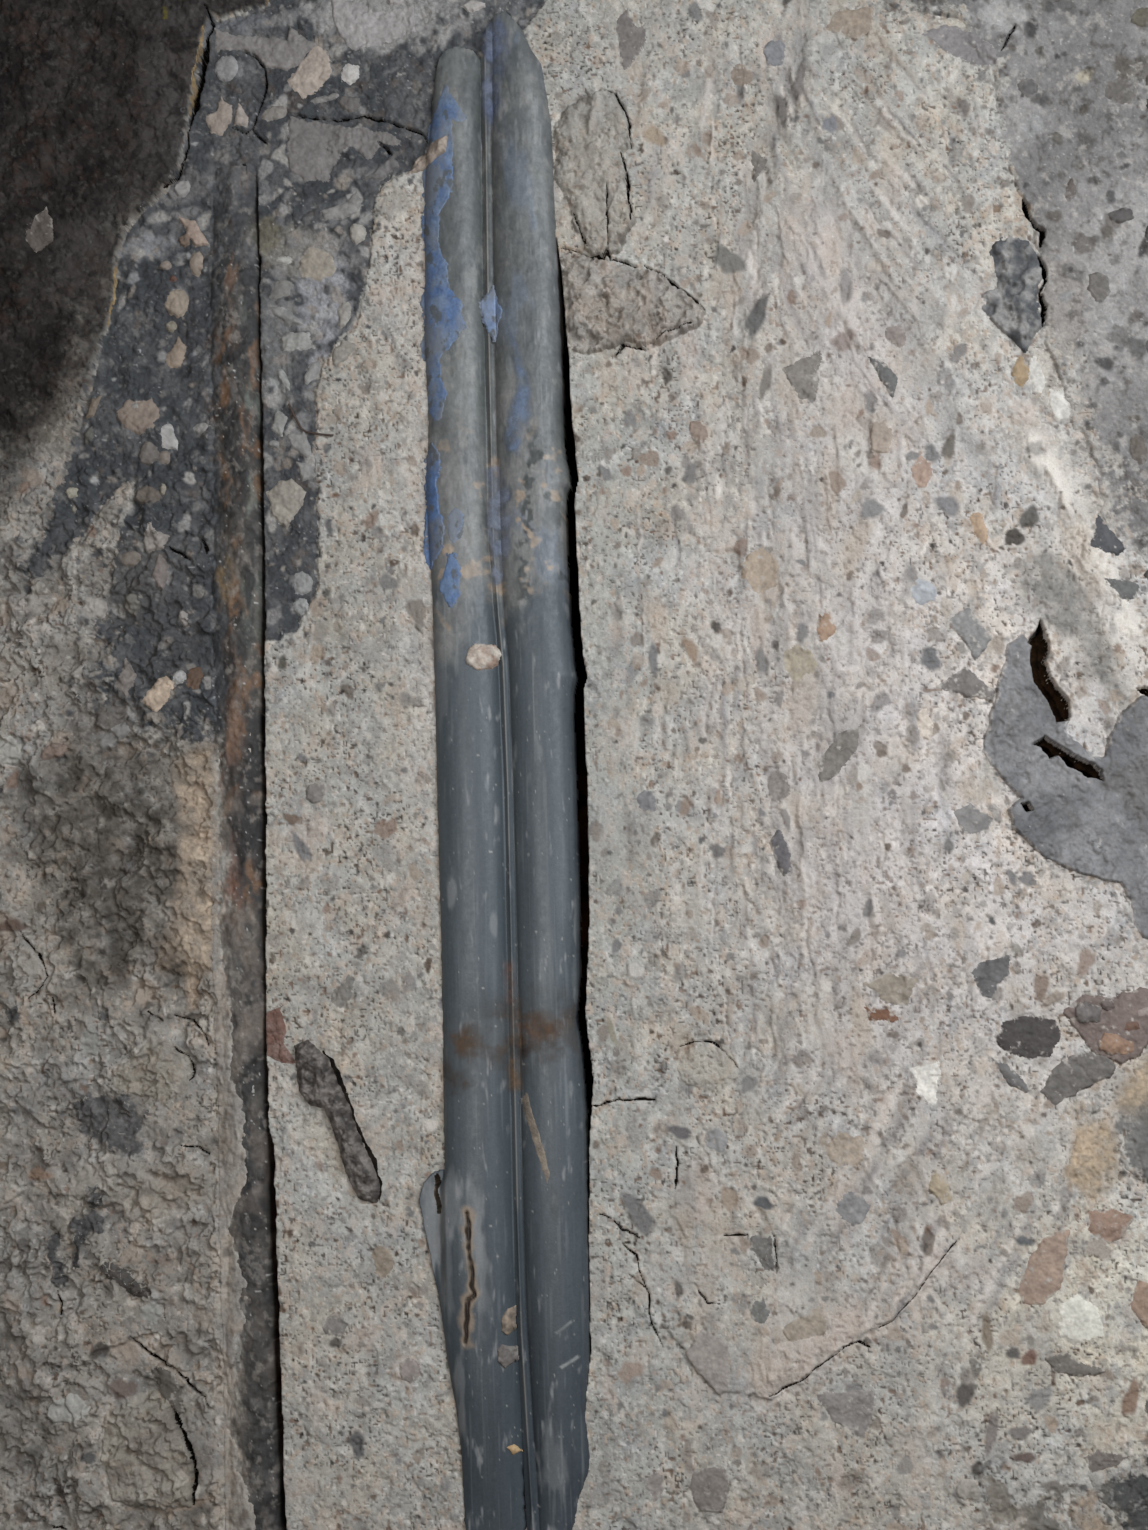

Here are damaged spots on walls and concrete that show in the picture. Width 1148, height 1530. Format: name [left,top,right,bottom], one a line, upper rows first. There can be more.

damp [0,0,144,264]
spalling [17,0,546,761]
spalling [885,0,1148,580]
crack [558,95,705,1130]
peeling [982,633,1148,939]
corrosion [266,1008,296,1064]
peeling [1120,1106,1148,1183]
crack [771,1240,957,1396]